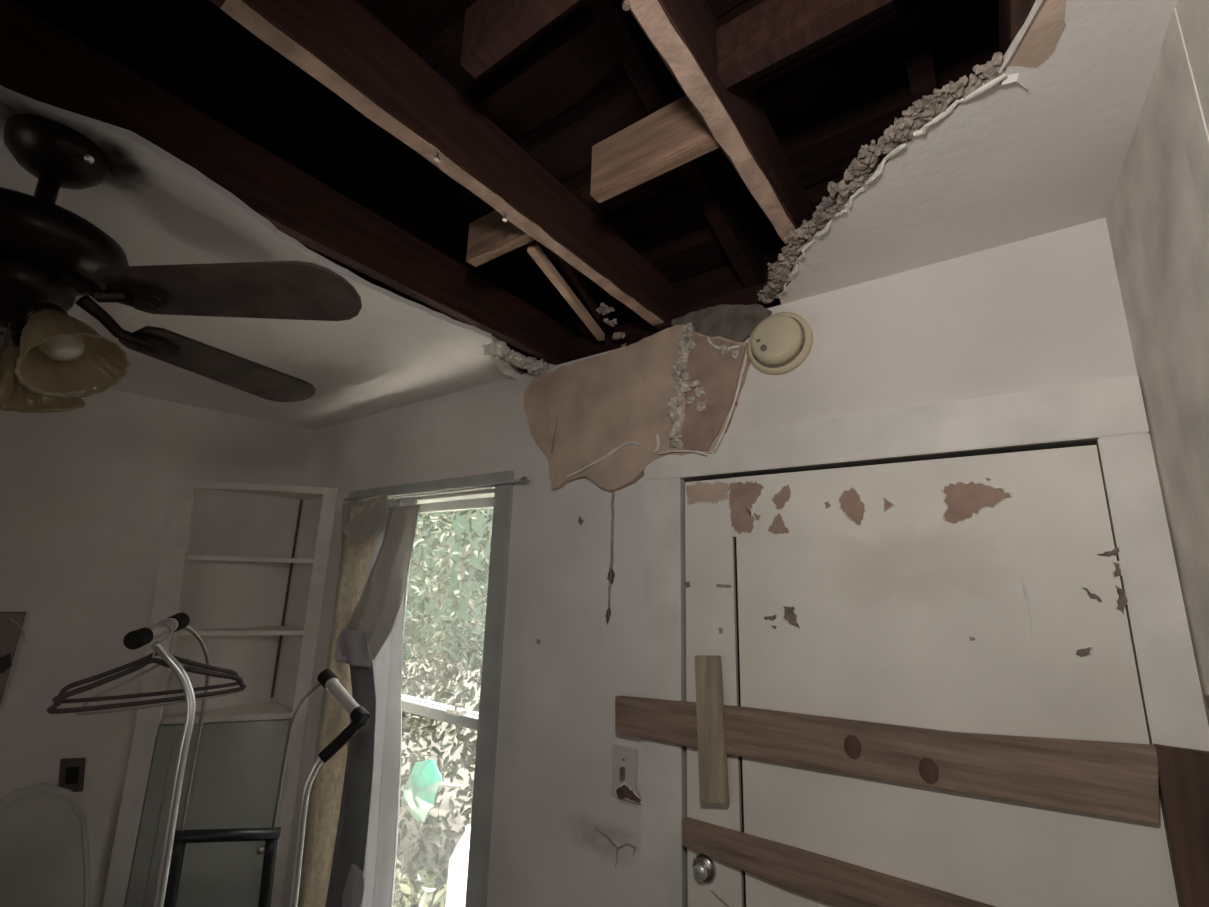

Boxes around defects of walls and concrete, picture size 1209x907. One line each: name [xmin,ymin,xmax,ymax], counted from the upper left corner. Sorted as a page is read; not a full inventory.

flaking render [757,52,1027,304]
flaking render [482,336,556,379]
peeling [685,480,793,535]
peeling [824,486,867,526]
peeling [940,478,1013,526]
peeling [1082,547,1128,614]
peeling [764,605,801,630]
peeling [1073,646,1094,657]